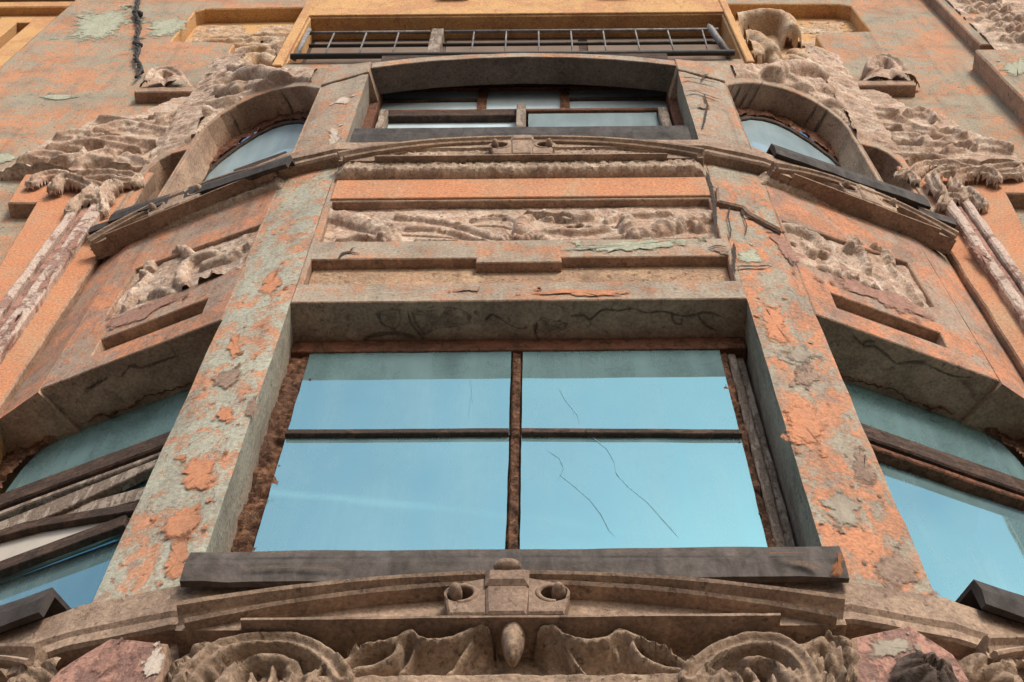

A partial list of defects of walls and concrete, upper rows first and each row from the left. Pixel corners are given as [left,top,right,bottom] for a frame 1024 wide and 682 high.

peeling [51,4,193,42]
crack [684,74,721,127]
crack [706,171,778,274]
peeling [563,237,772,266]
peeling [516,287,629,296]
flaking render [203,325,247,389]
peeling [754,295,825,389]
peeling [212,393,262,424]
peeling [781,402,828,457]
flaking render [819,445,882,533]
peeling [150,450,229,587]
flaking render [863,543,939,595]